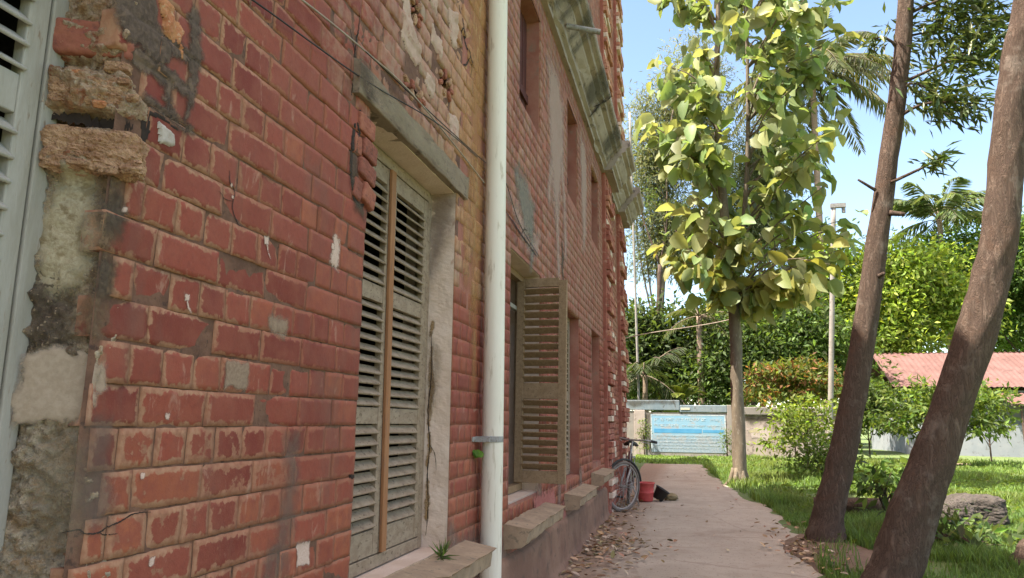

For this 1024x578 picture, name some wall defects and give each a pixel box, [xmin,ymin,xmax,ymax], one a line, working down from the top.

spalling [52,17,139,108]
peeling [401,0,459,143]
spalling [38,124,149,183]
flaking render [11,345,107,425]
crack [425,338,436,535]